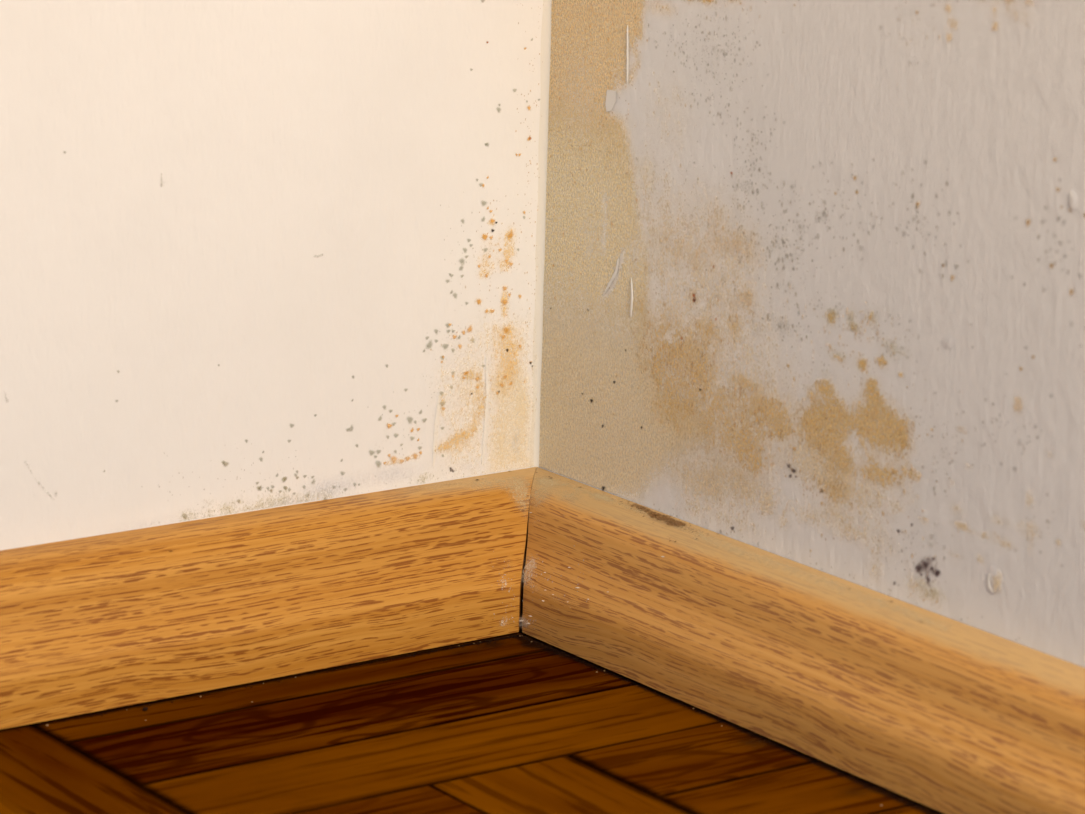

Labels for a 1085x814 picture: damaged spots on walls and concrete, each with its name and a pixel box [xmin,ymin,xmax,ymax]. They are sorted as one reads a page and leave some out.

leakage [438,0,920,536]